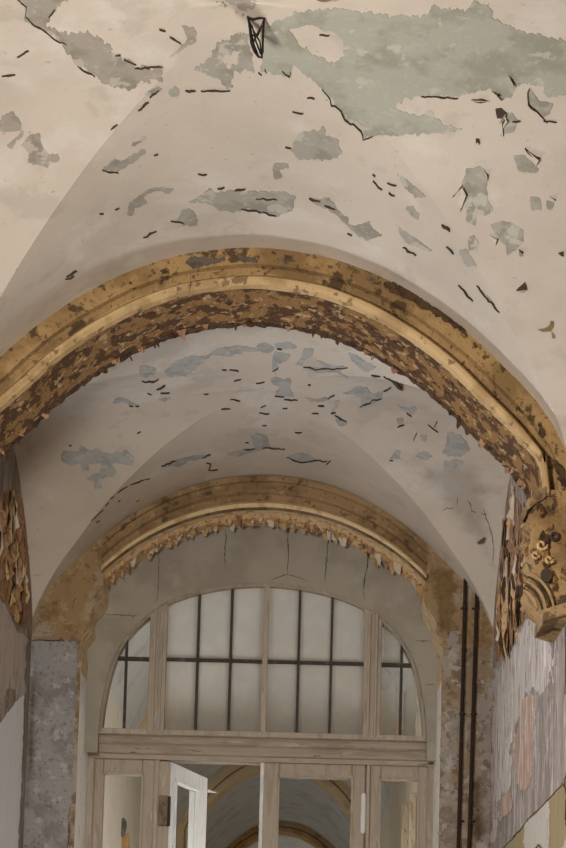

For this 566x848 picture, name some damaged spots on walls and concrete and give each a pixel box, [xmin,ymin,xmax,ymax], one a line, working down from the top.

peeling [17,0,566,141]
peeling [0,111,60,168]
peeling [102,136,158,174]
peeling [285,126,342,161]
peeling [514,148,540,173]
peeling [171,187,296,227]
peeling [309,197,382,241]
peeling [372,174,426,220]
peeling [446,166,493,267]
peeling [489,221,524,257]
flaking render [384,282,478,348]
peeling [0,321,555,848]